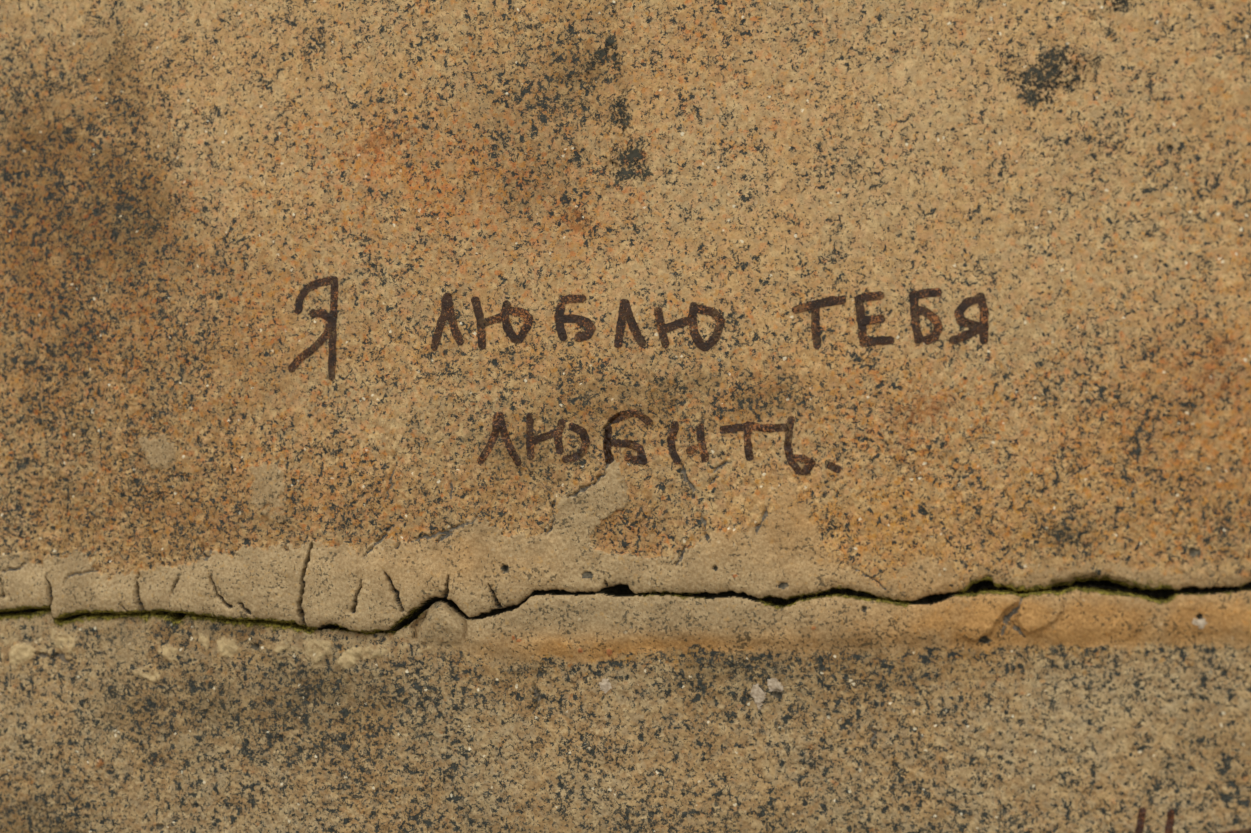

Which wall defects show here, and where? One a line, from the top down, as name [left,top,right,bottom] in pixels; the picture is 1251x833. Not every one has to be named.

crack [0,563,187,621]
crack [202,461,1251,638]